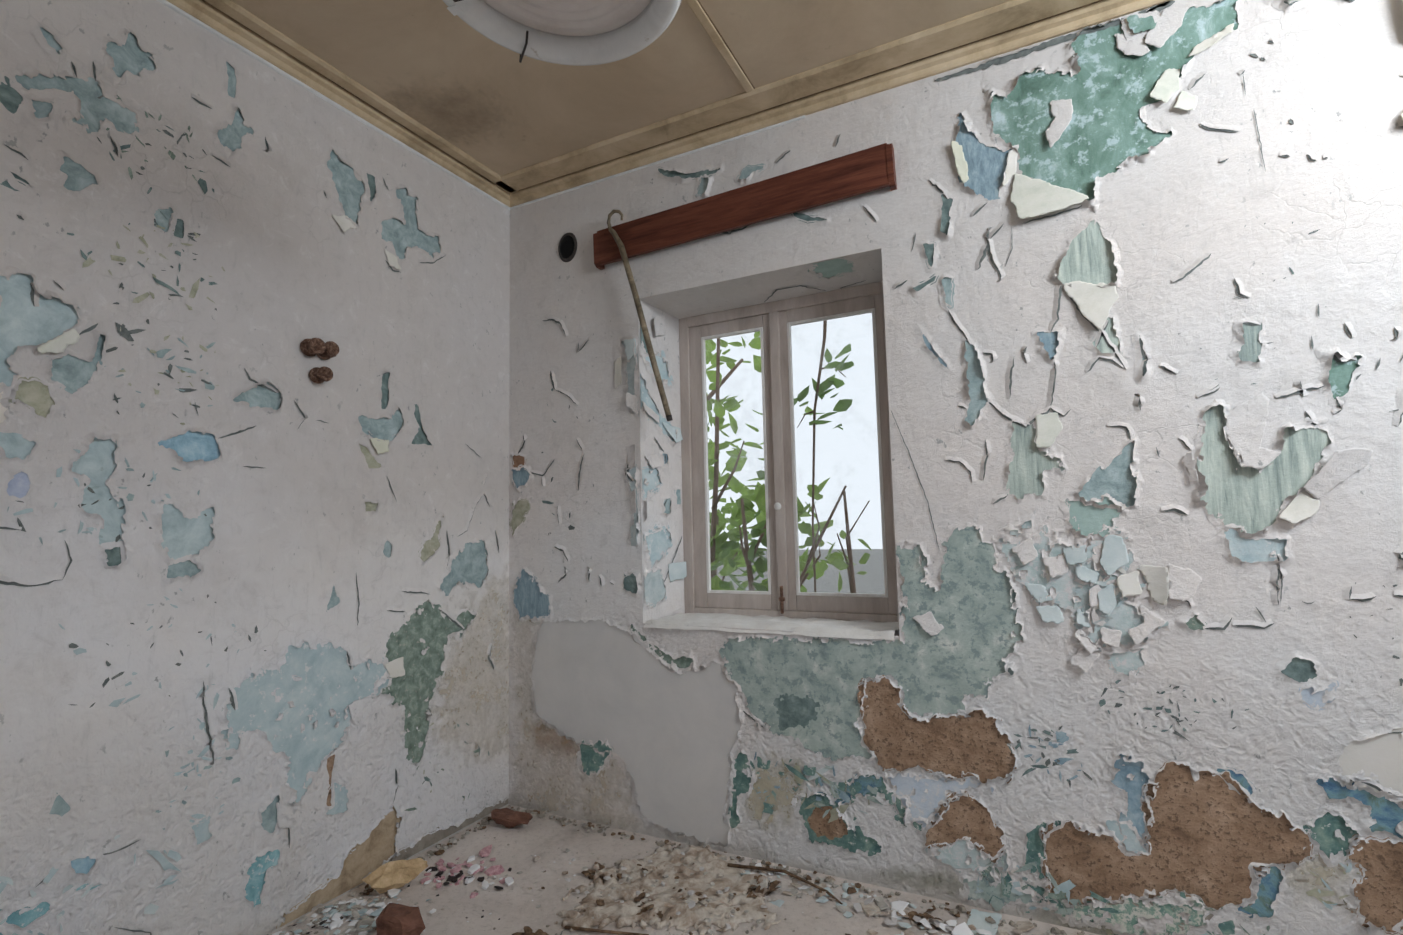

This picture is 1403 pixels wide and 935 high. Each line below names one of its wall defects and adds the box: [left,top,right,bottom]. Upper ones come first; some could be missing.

peeling [0,18,272,311]
peeling [0,266,327,648]
peeling [351,366,435,517]
peeling [509,451,575,539]
peeling [614,0,1403,935]
peeling [59,624,87,655]
peeling [70,643,141,707]
peeling [156,510,509,930]
peeling [511,565,554,623]
peeling [0,839,141,935]